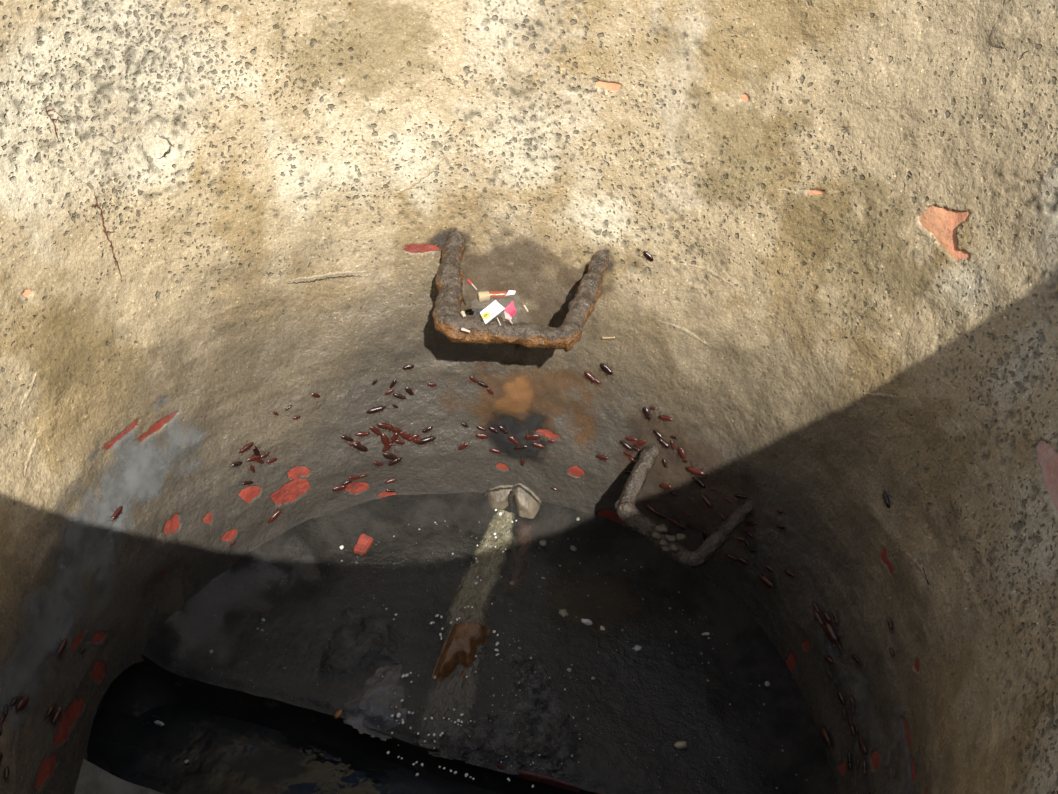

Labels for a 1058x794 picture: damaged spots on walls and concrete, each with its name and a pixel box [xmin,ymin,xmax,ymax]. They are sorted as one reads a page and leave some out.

crack [91,191,122,278]
flaking render [919,205,971,260]
flaking render [1036,440,1058,511]
leakage [0,425,202,719]